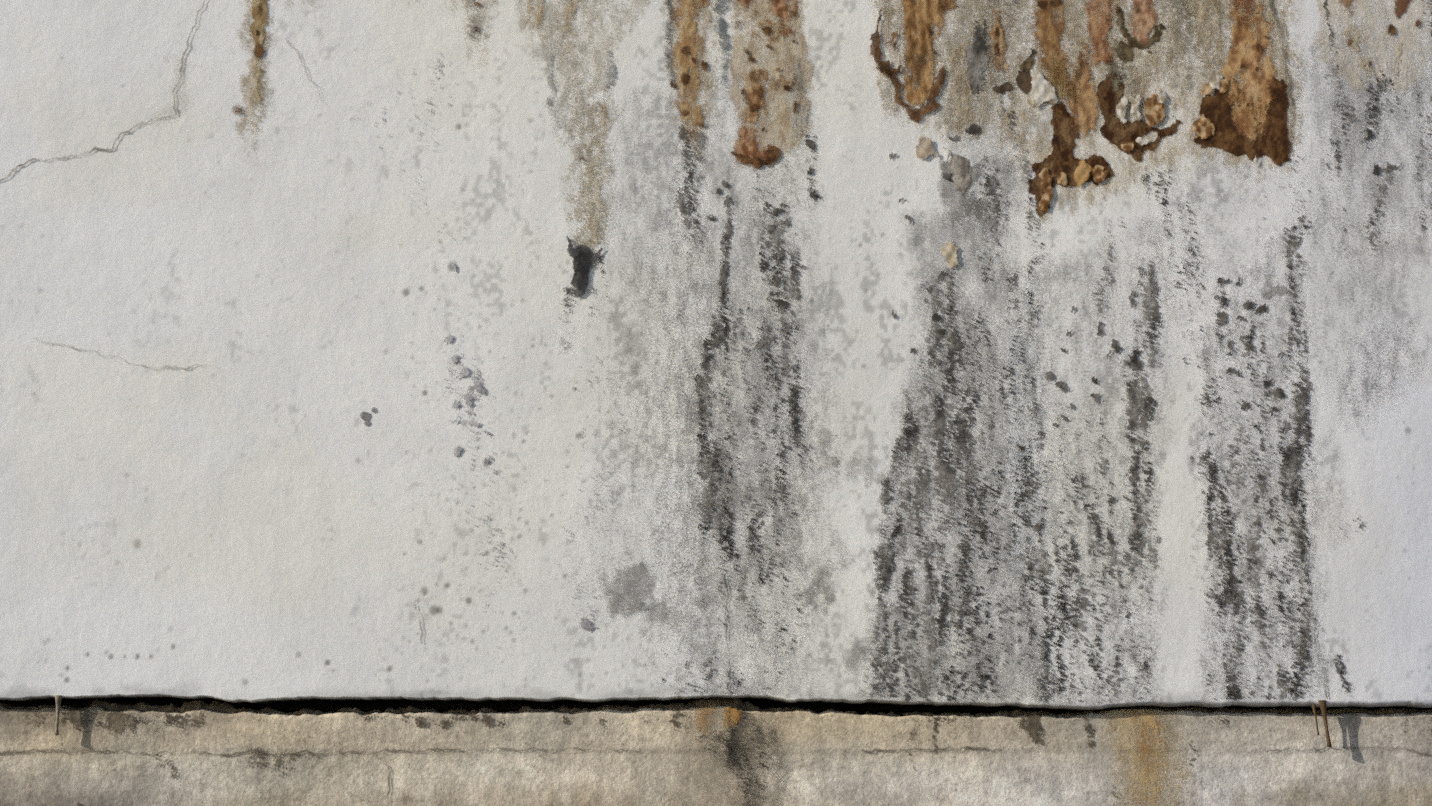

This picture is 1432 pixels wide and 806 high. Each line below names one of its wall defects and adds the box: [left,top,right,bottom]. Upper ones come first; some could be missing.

crack [1,0,205,181]
rust [233,0,272,134]
rust [453,0,494,42]
rust [517,0,813,269]
rust [870,0,1301,221]
rust [1315,0,1432,93]
damp [563,236,608,322]
damp [442,334,512,571]
damp [572,117,855,806]
damp [846,0,1432,771]
damp [24,708,206,739]
damp [354,713,506,729]